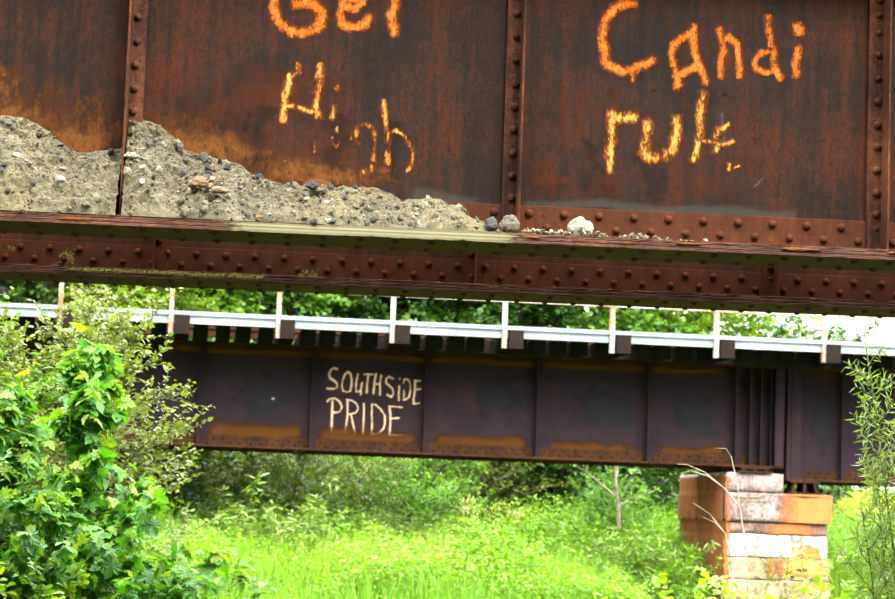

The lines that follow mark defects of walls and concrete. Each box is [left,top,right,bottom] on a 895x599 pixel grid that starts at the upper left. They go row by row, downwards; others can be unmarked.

rust [0,61,122,153]
rust [144,107,396,187]